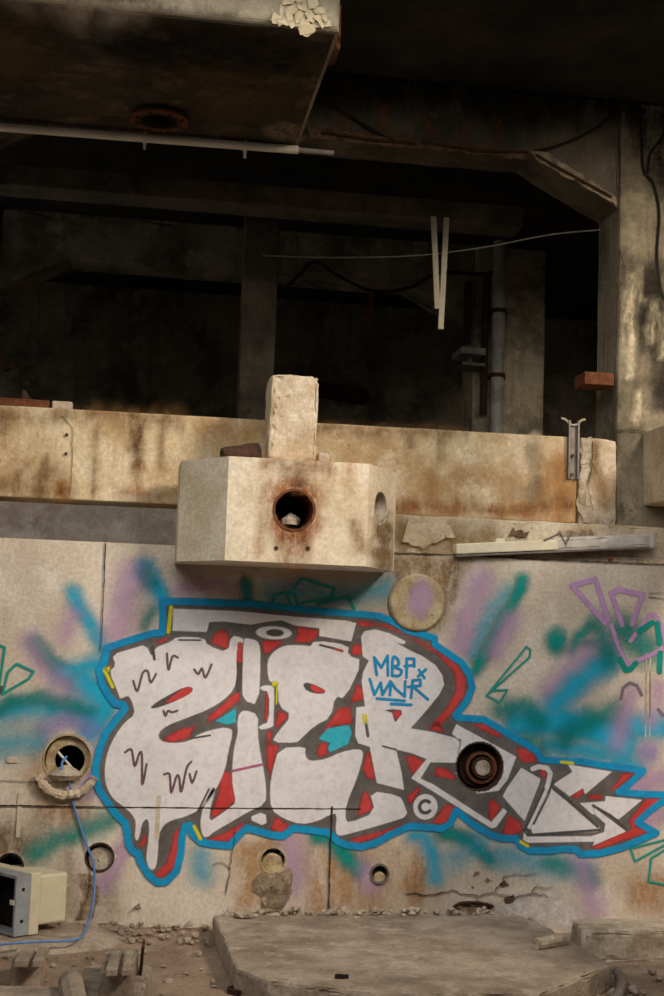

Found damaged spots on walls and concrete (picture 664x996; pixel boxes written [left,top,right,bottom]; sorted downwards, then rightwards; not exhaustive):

leakage [631,261,664,410]
corrosion [0,397,50,420]
corrosion [265,461,323,500]
crack [407,872,553,907]